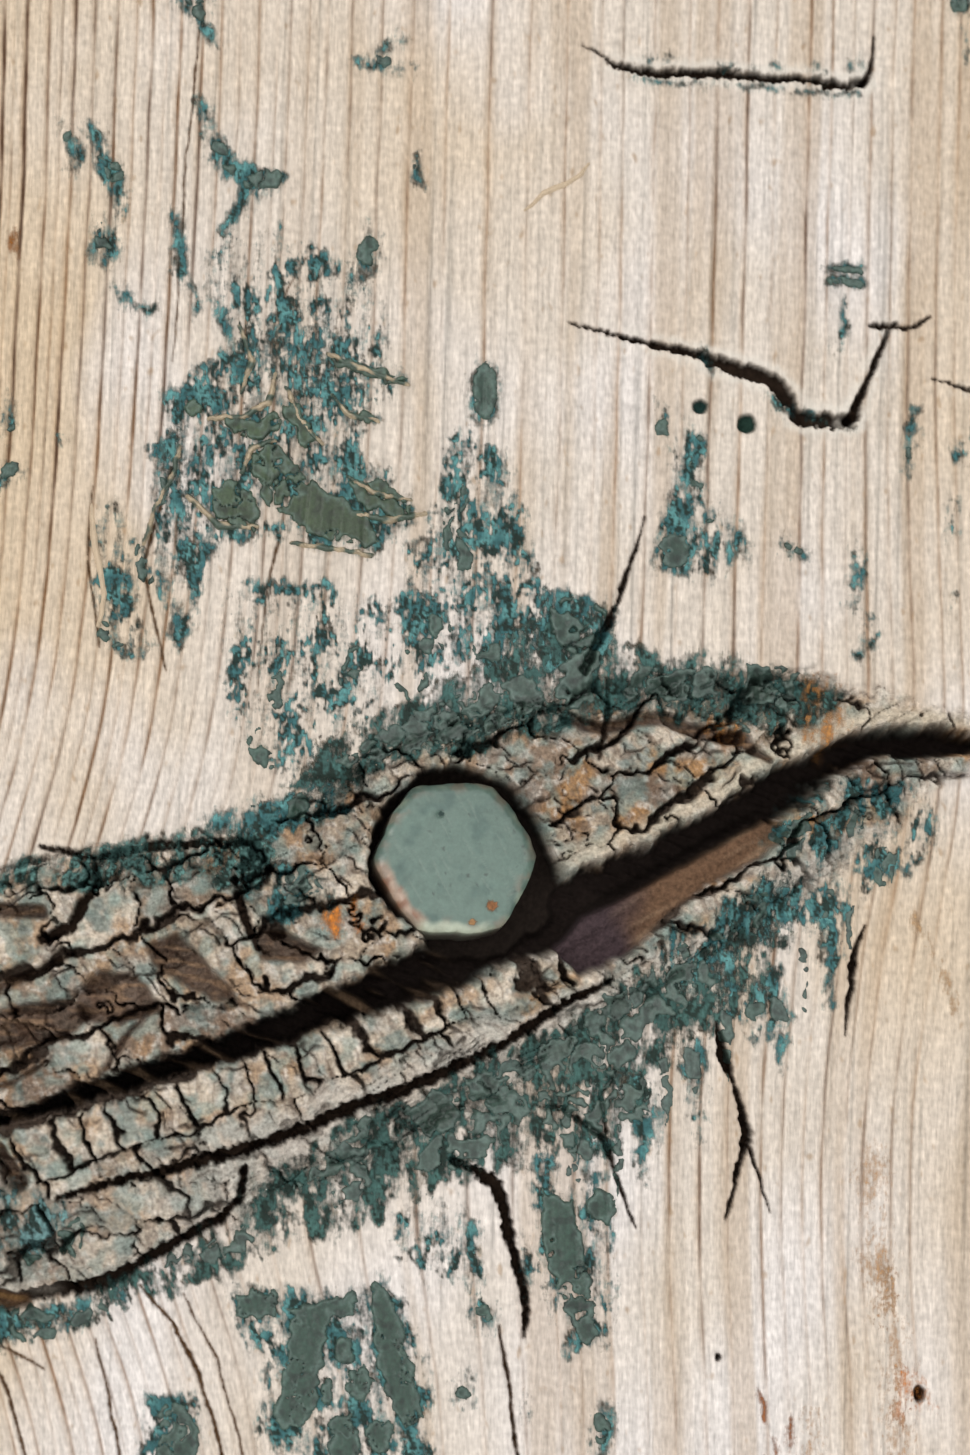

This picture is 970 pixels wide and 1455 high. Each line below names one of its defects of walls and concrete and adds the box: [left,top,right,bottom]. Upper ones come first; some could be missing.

peeling [176,0,218,49]
crack [590,37,876,92]
peeling [63,119,127,267]
peeling [191,96,288,258]
peeling [411,151,426,189]
crack [570,316,931,431]
peeling [0,211,849,925]
crack [600,532,641,633]
crack [0,725,970,1126]
peeling [0,775,935,1455]
crack [715,1022,766,1218]
crack [20,978,614,1455]